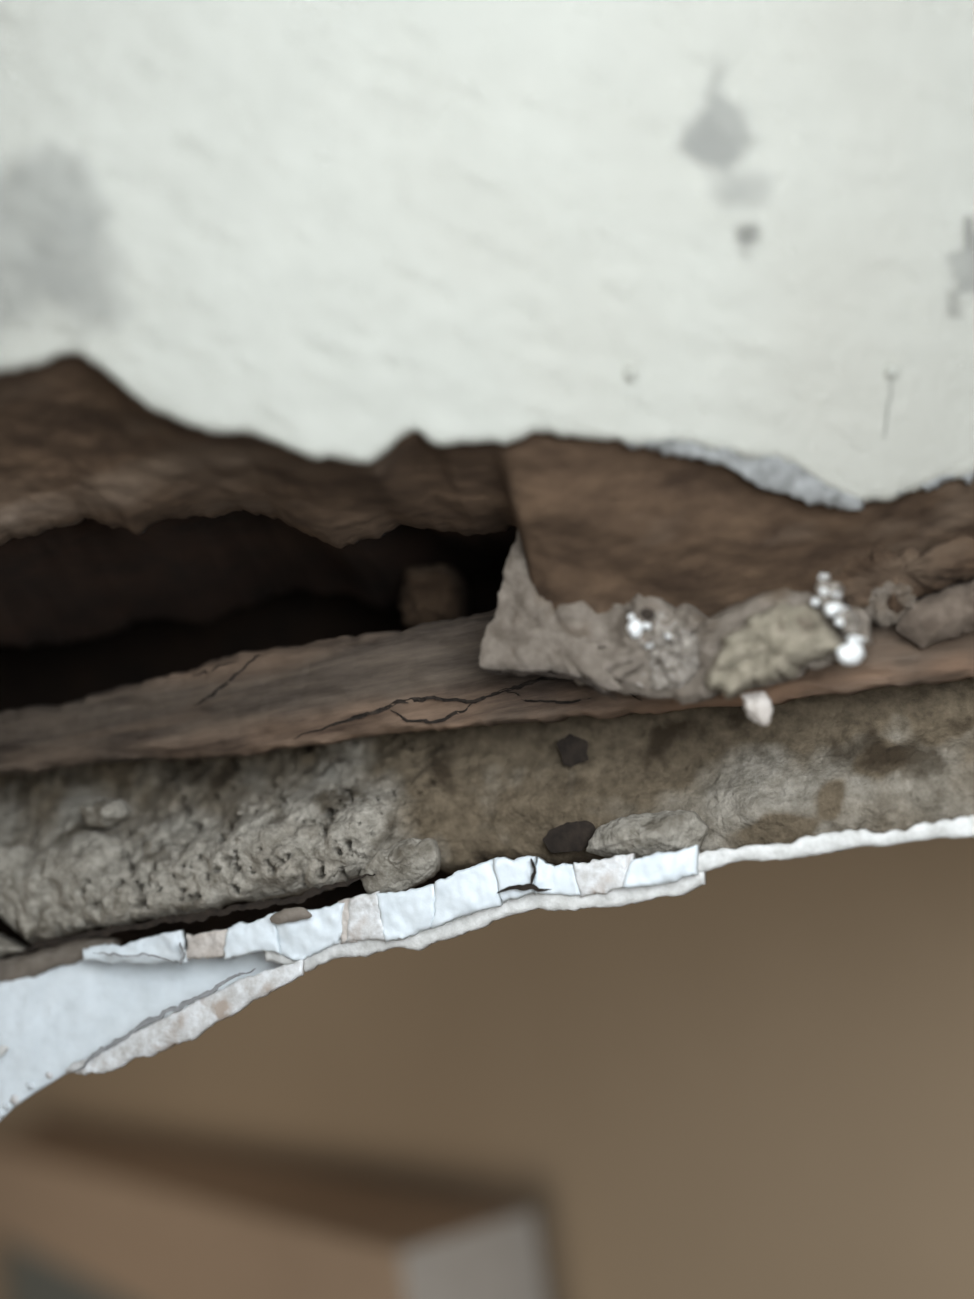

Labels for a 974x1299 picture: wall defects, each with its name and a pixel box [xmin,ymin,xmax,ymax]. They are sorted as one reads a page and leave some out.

flaking render [0,353,974,1121]